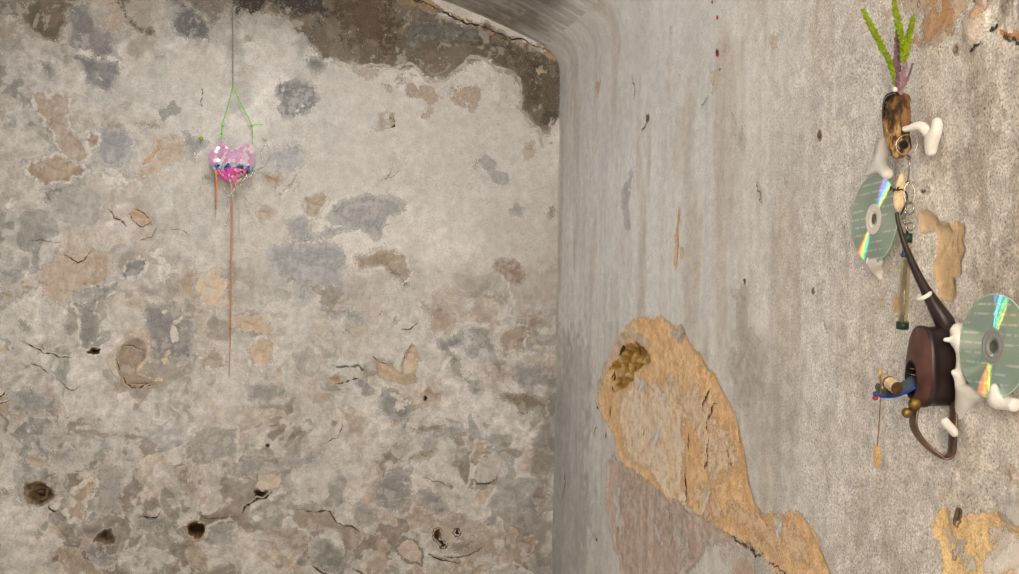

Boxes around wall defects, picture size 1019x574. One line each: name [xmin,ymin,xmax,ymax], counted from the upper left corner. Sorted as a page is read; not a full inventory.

damp [0,0,83,49]
damp [101,0,159,40]
peeling [896,0,990,57]
crack [970,19,1019,52]
damp [183,0,560,148]
spalling [918,209,967,306]
crack [19,339,79,391]
spalling [326,345,444,402]
peeling [597,315,834,574]
spalling [0,480,56,507]
spalling [92,527,117,545]
peeling [931,506,1019,574]